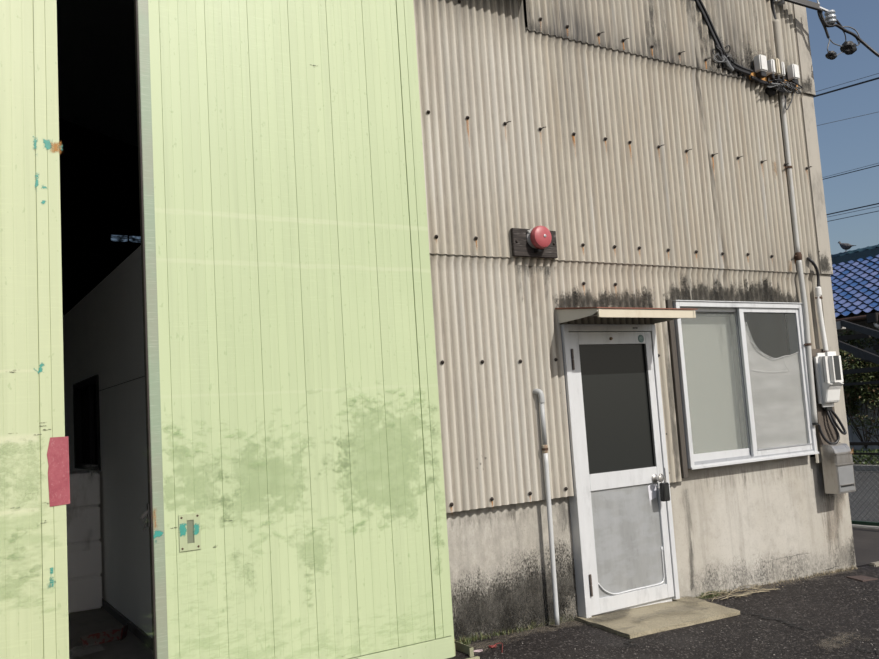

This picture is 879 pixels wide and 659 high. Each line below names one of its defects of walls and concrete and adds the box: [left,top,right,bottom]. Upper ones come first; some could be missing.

leakage [555,289,653,308]
leakage [663,276,798,303]
leakage [451,544,578,641]